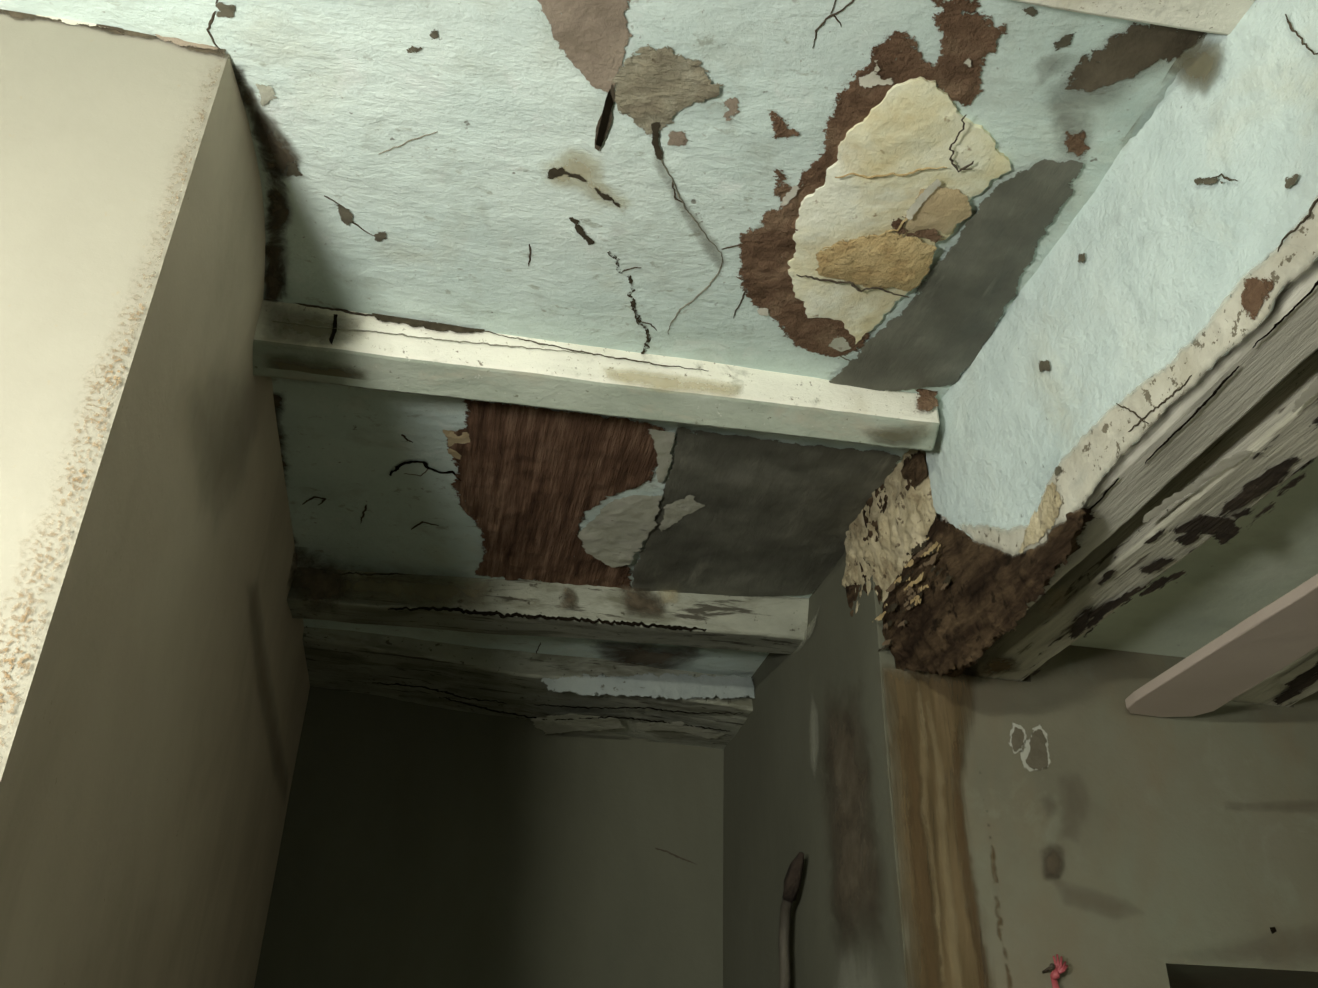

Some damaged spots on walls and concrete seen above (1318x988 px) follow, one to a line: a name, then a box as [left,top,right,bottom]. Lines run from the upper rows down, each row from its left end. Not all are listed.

crack [206,0,220,49]
peeling [537,0,632,151]
crack [813,0,854,47]
crack [264,117,738,371]
spalling [736,0,1008,359]
crack [1208,173,1237,181]
spalling [1241,276,1275,320]
crack [961,197,1318,555]
crack [389,434,461,481]
flaking render [578,429,675,568]
spalling [842,389,939,617]
peeling [1018,436,1317,682]